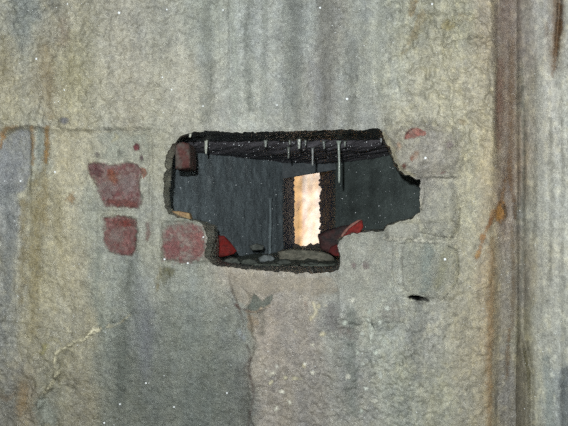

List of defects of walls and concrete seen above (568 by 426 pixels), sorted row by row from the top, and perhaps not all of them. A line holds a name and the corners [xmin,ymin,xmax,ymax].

rust [552,0,562,70]
spalling [398,128,426,147]
peeling [89,130,150,208]
peeling [104,216,137,255]
spalling [162,223,204,263]
spalling [293,224,350,256]
rust [480,197,517,238]